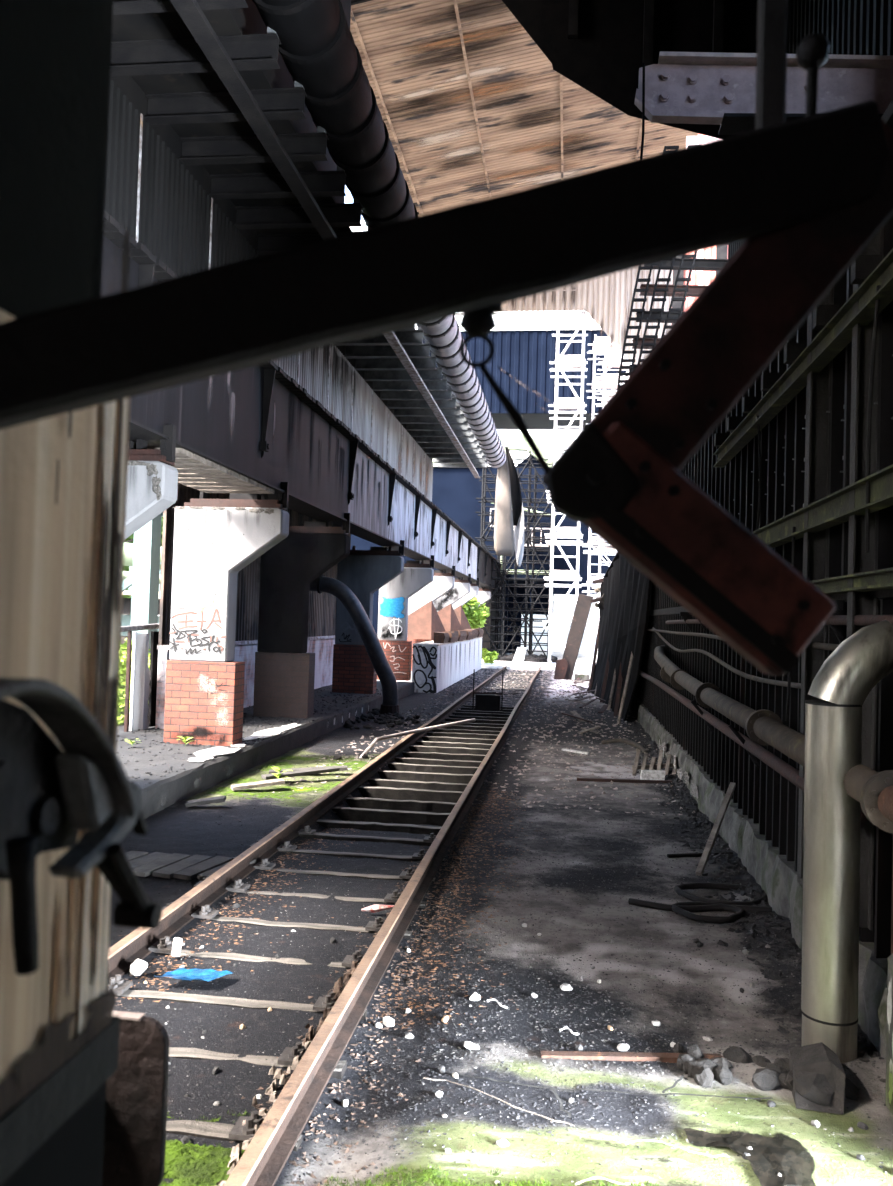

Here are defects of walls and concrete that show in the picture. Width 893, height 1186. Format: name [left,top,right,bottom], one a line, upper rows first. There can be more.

corrosion [414,25,517,52]
damp [227,372,235,431]
damp [311,346,356,404]
damp [273,394,385,512]